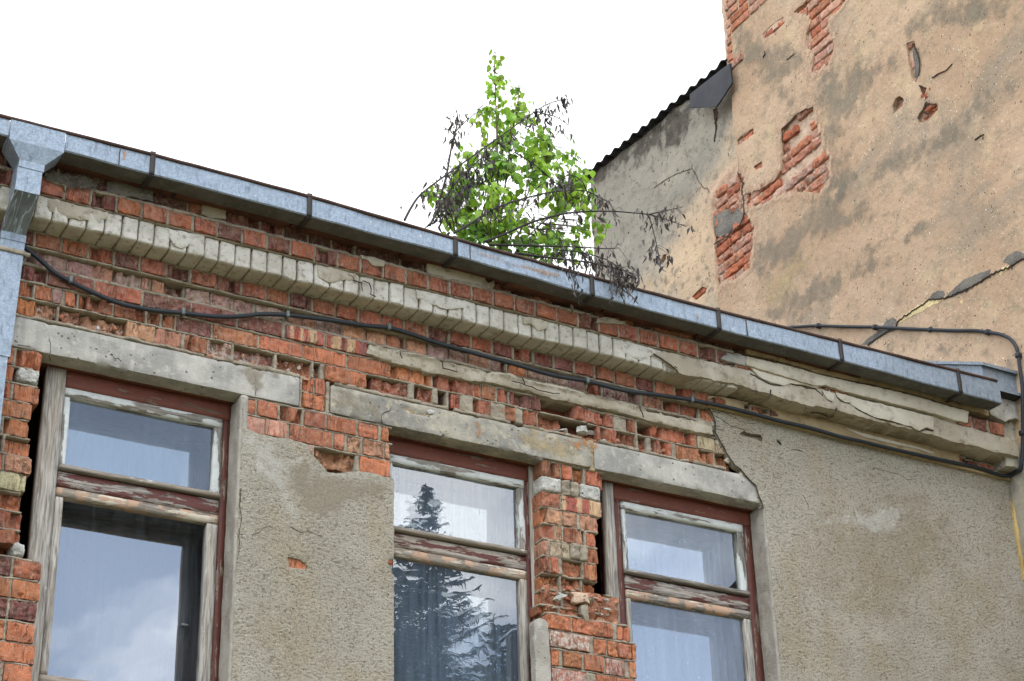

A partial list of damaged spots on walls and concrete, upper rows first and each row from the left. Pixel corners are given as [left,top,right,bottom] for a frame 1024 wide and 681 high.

spalling [722,0,766,69]
spalling [763,0,848,79]
spalling [907,42,938,124]
spalling [693,92,836,299]
spalling [862,251,1024,345]
spalling [539,425,666,455]
crack [750,373,934,432]
spalling [538,584,620,624]